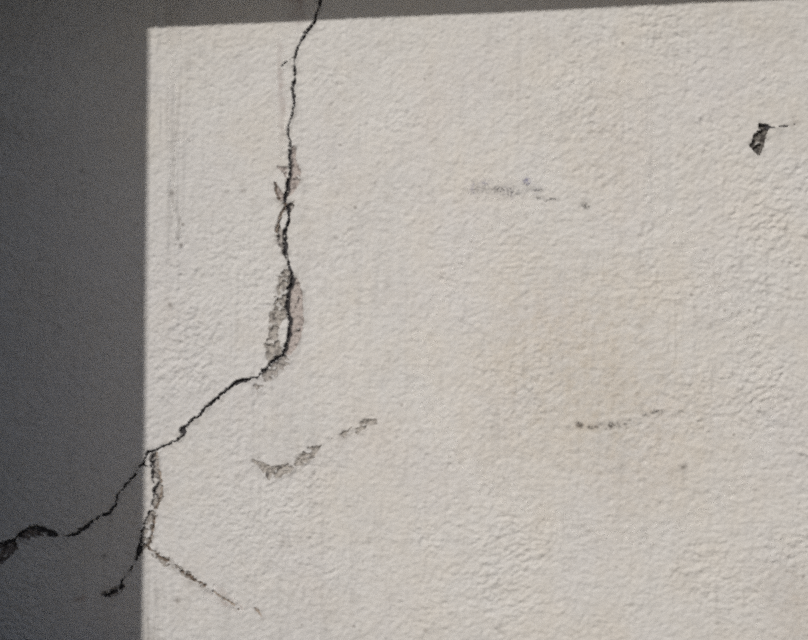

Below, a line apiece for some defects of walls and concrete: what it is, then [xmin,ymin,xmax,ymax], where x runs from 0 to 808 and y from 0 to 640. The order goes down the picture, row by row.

hole [749,123,795,155]
peeling [274,145,302,259]
crack [0,0,322,617]
peeling [253,269,305,393]
peeling [252,445,321,481]
peeling [331,419,377,439]